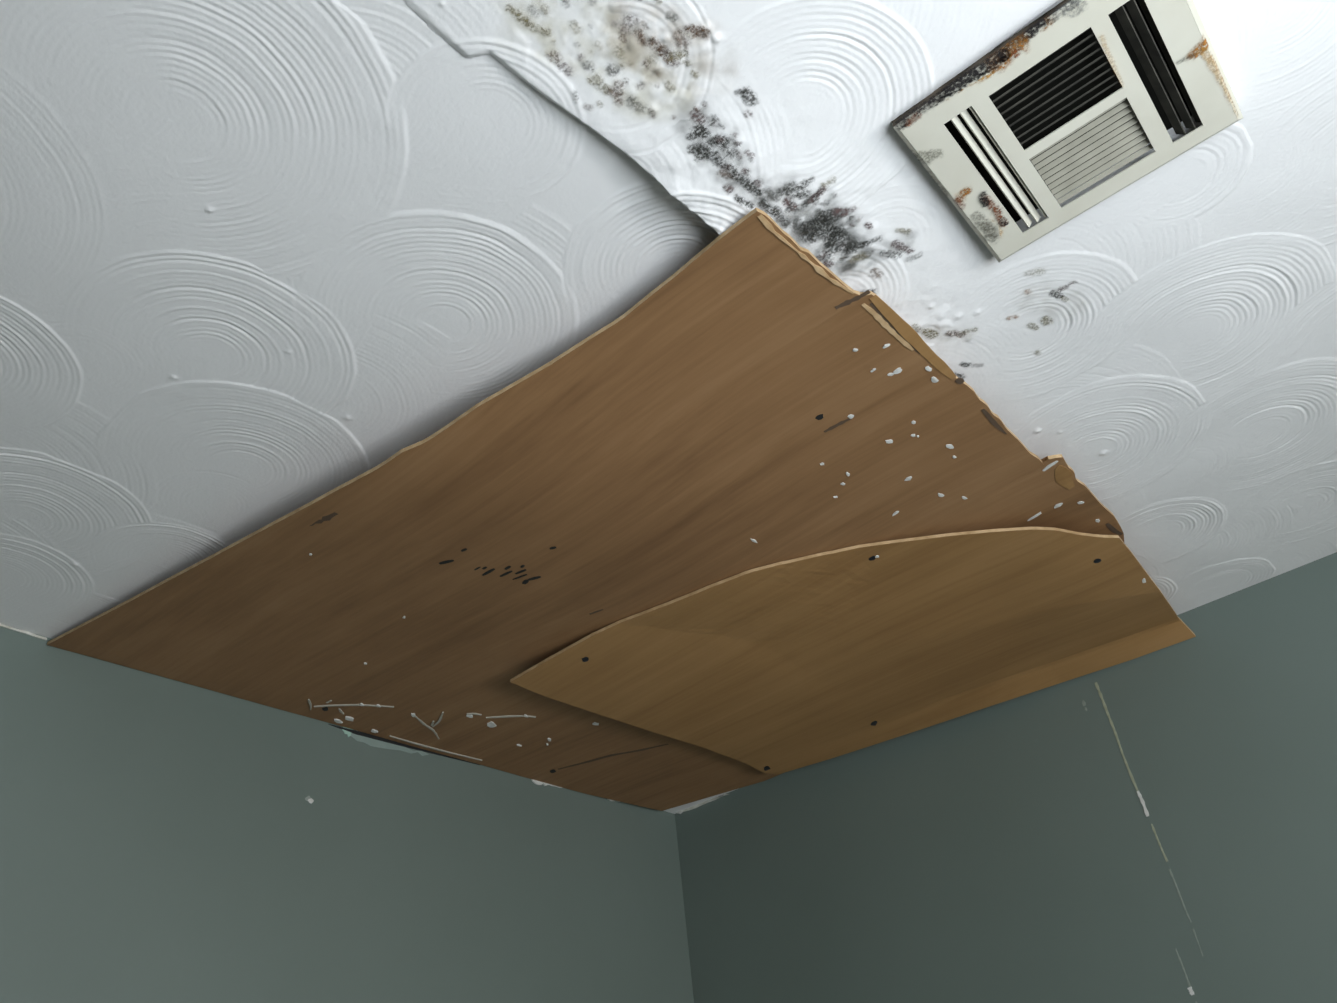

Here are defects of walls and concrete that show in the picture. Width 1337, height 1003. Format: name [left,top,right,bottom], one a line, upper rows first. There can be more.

water stain [635,2,710,77]
corrosion [961,34,1028,91]
corrosion [1187,38,1209,59]
water stain [736,88,756,117]
water stain [687,108,914,293]
corrosion [955,188,1008,234]
crack [1094,682,1203,1003]